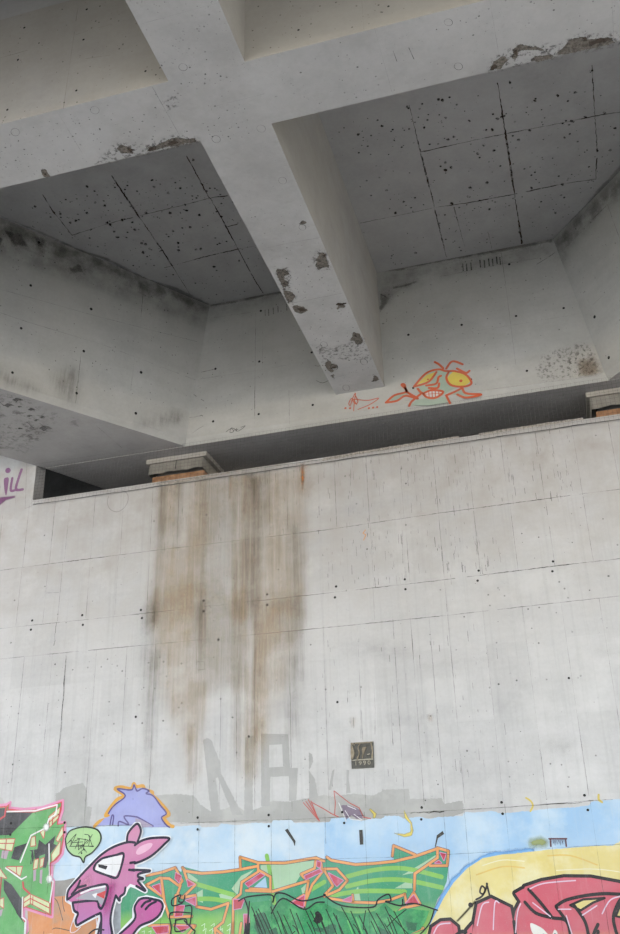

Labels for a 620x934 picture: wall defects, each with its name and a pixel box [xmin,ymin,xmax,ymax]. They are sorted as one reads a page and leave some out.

spalling [490,36,615,70]
spalling [148,131,196,151]
spalling [308,253,329,291]
spalling [276,269,308,314]
spalling [346,327,363,347]